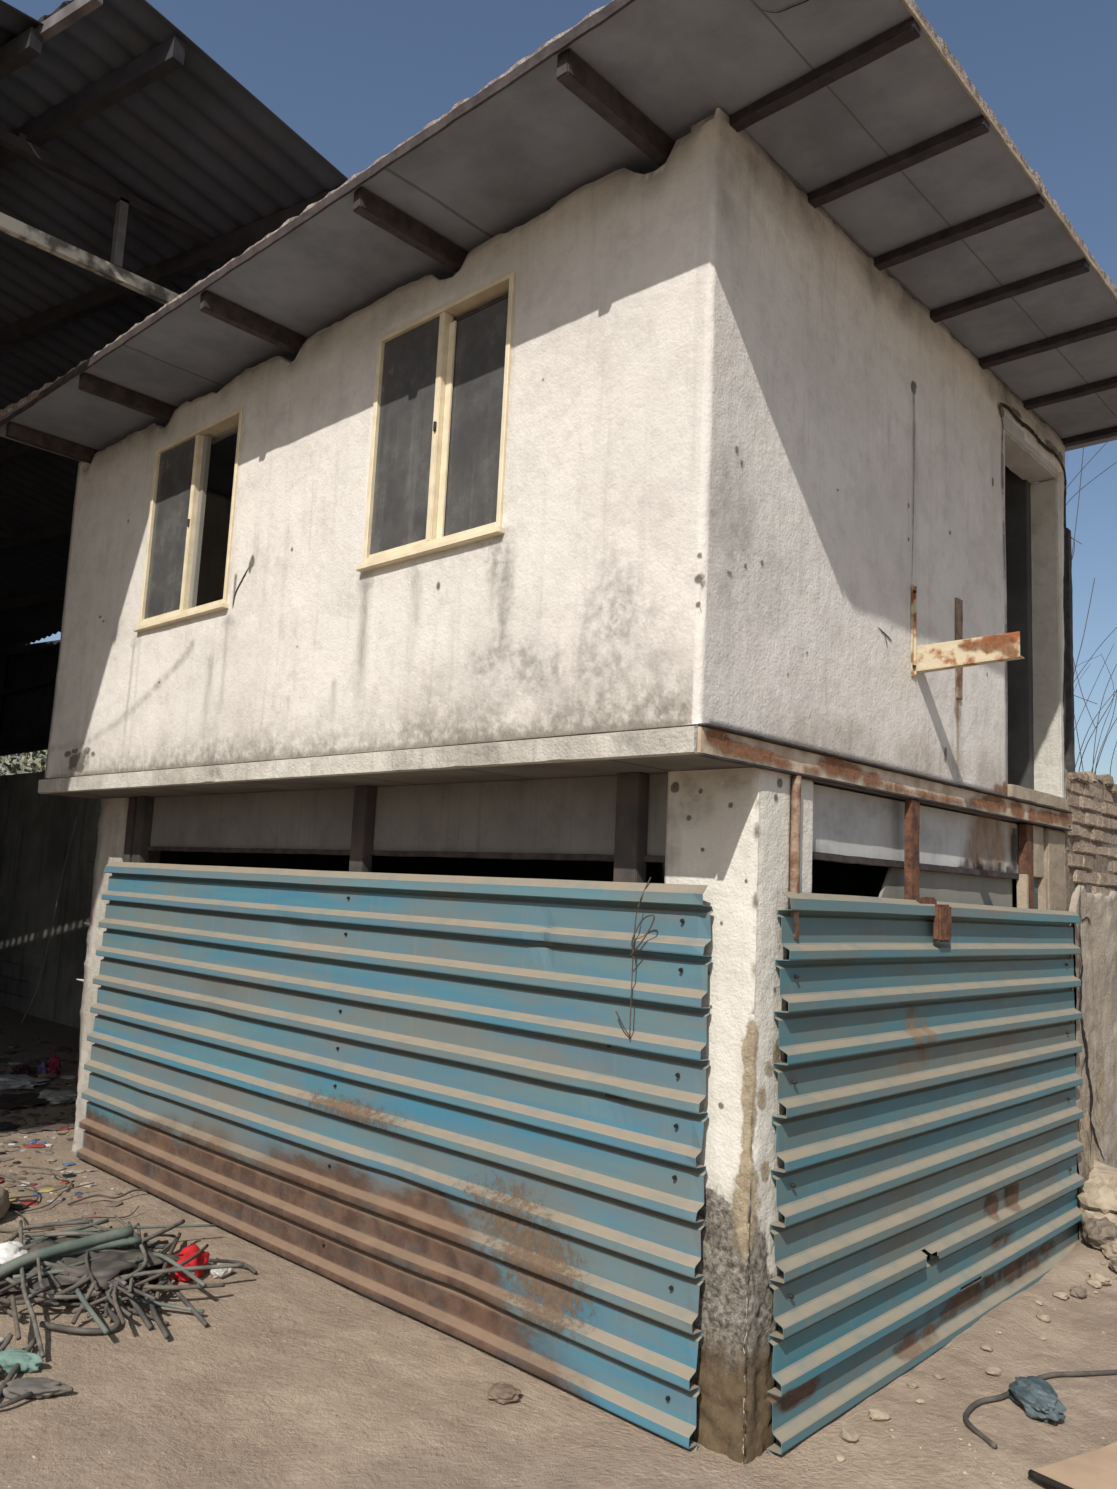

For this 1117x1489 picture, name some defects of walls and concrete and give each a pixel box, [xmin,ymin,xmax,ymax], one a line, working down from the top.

crack [760,0,809,13]
rust [959,635,1018,658]
rust [707,728,1070,873]
rust [309,1093,397,1130]
rust [985,1180,1019,1247]
rust [77,1107,594,1398]
rust [894,1241,1053,1359]
rust [766,1377,818,1411]